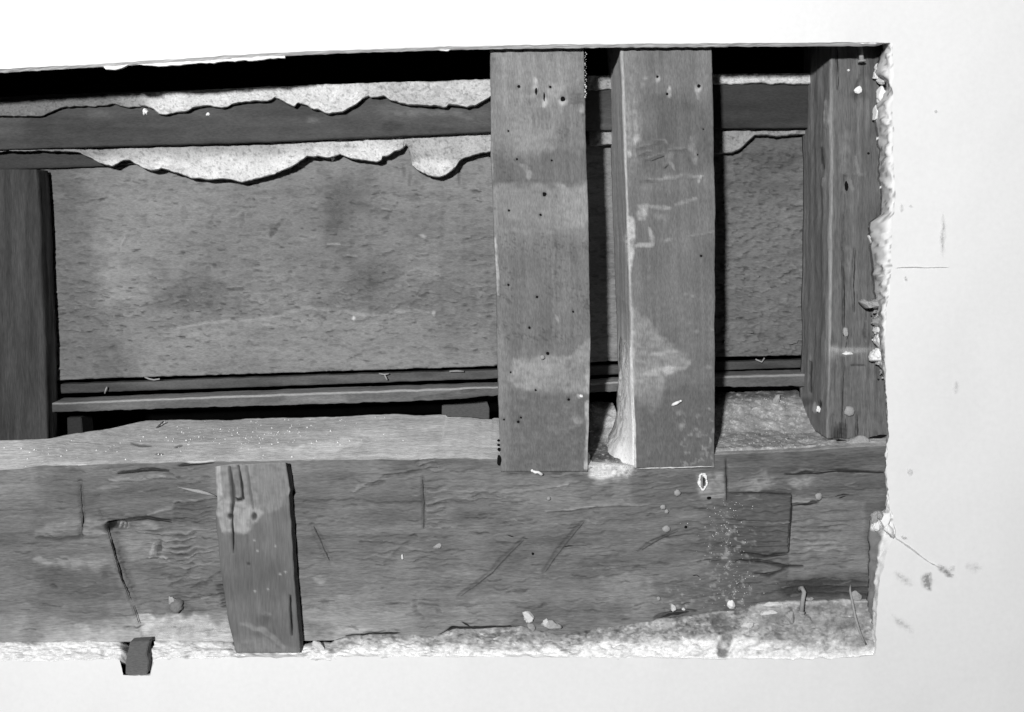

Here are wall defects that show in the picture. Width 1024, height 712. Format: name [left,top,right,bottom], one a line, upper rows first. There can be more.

spalling [872,63,886,120]
crack [893,524,938,567]